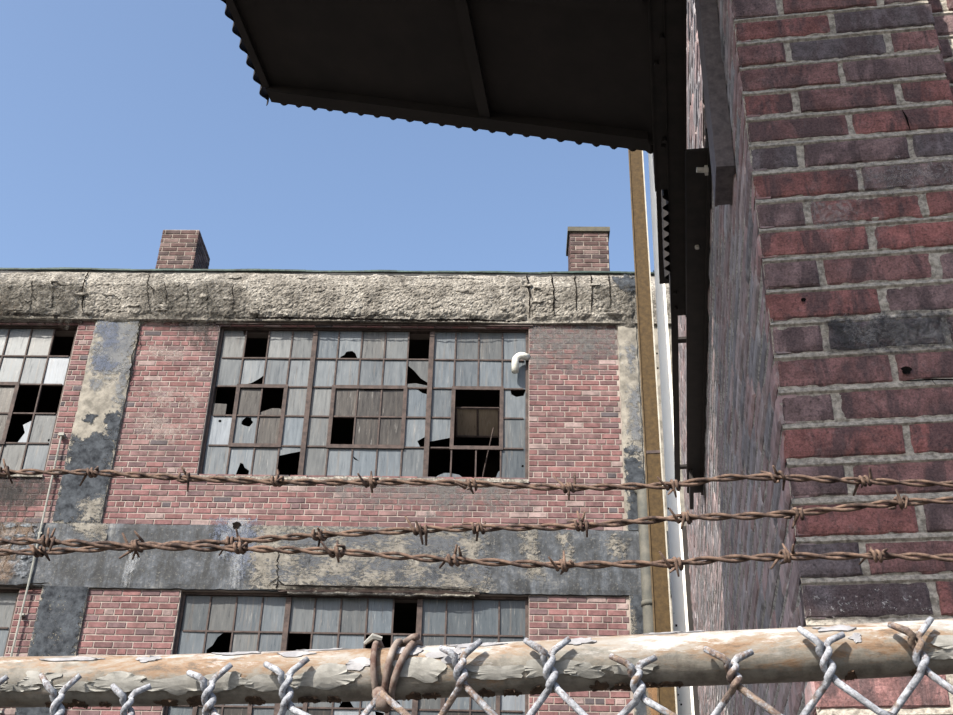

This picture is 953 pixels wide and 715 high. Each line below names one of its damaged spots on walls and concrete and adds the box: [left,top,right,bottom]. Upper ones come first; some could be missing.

crack [125,271,612,389]
damp [209,517,262,580]